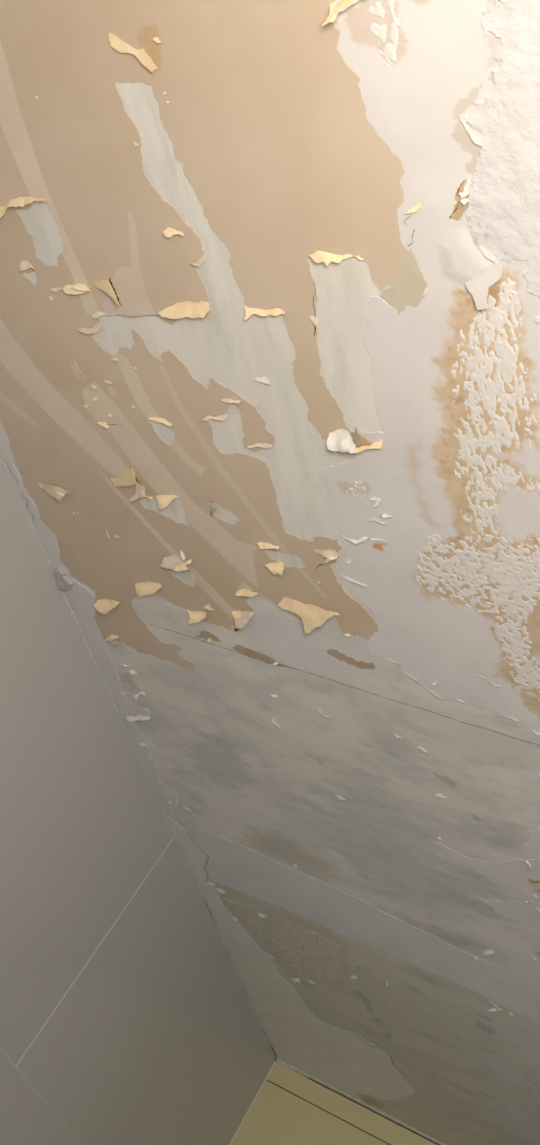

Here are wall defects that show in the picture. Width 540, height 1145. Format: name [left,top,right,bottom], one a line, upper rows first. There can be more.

peeling [447,0,540,297]
peeling [0,0,434,670]
water stain [397,255,540,724]
peeling [120,692,151,722]
water stain [169,715,273,800]
water stain [220,666,540,959]